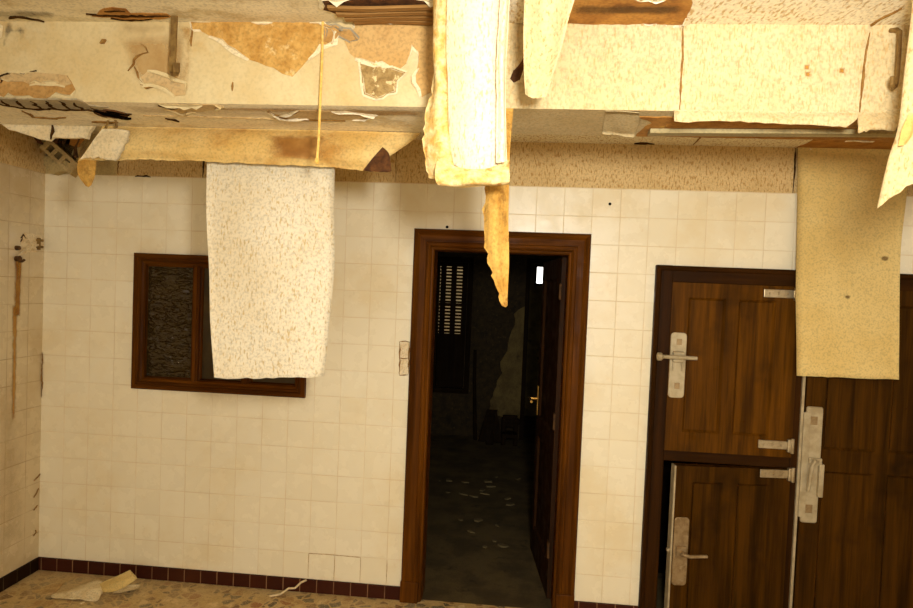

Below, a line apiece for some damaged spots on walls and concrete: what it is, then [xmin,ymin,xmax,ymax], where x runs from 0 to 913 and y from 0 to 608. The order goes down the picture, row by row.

peeling [92,7,171,20]
peeling [189,0,434,101]
flaking render [510,50,524,84]
peeling [0,69,421,172]
peeling [636,116,898,150]